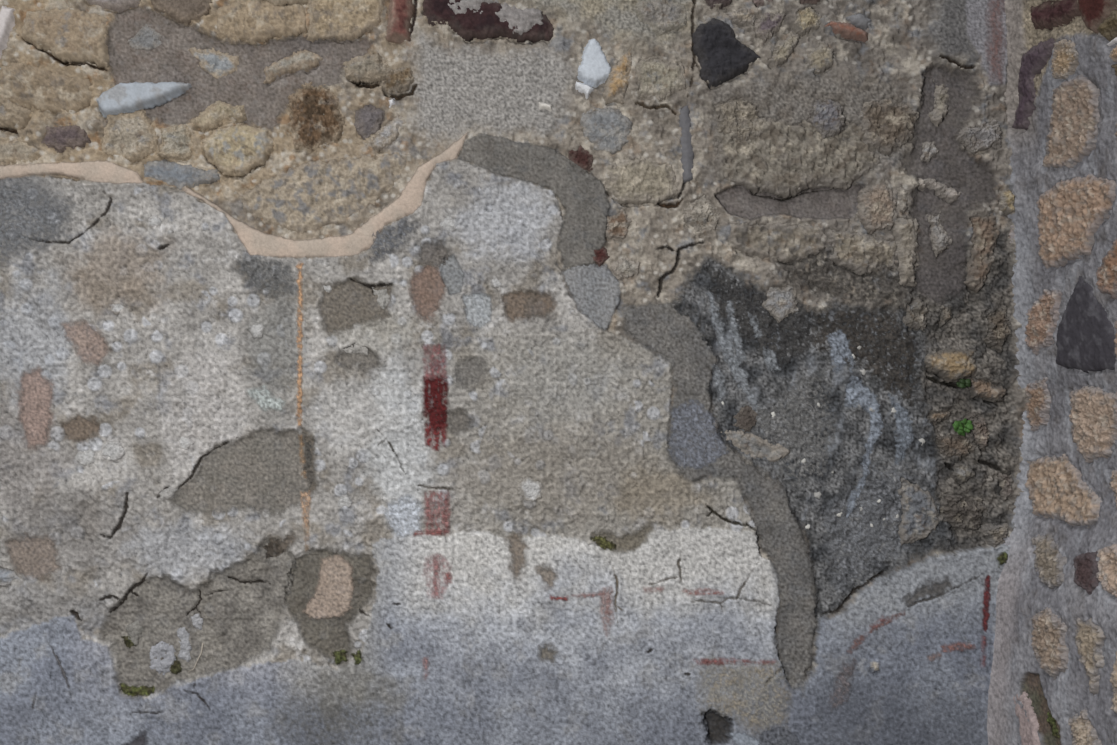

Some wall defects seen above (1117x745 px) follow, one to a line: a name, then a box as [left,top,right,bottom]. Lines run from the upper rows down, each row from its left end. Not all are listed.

peeling [0,6,15,69]
crack [635,0,709,115]
crack [33,198,112,244]
crack [657,242,704,297]
crack [157,442,228,498]
spalling [159,428,316,515]
crack [101,492,128,538]
crack [651,559,755,607]
spalling [101,534,376,697]
spalling [704,710,731,743]